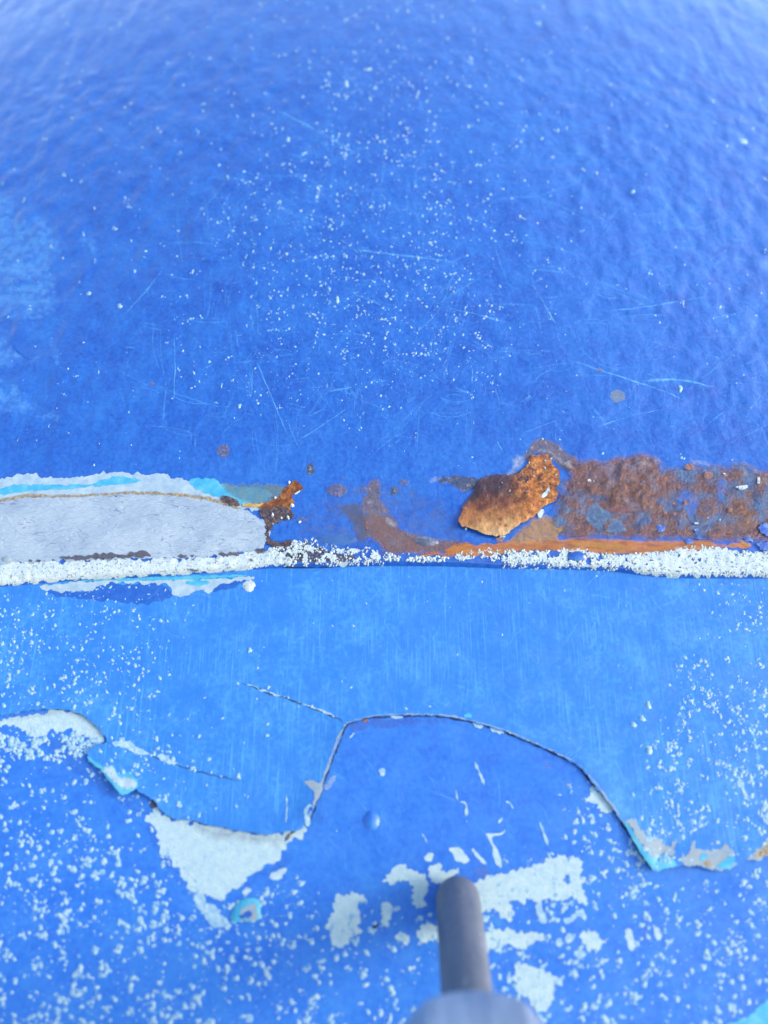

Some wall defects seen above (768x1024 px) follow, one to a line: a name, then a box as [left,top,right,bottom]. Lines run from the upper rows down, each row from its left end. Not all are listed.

corrosion [328,439,768,556]
peeling [0,463,768,1024]
crack [245,684,654,870]